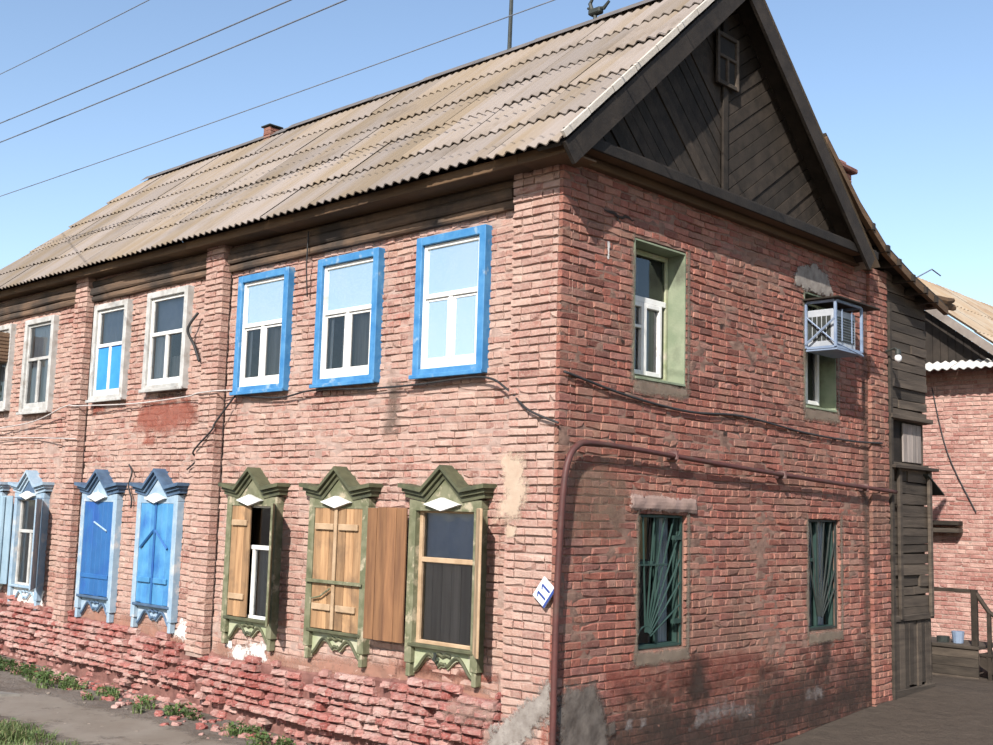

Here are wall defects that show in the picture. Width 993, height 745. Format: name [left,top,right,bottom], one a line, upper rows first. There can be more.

spalling [0,595,503,745]
water stain [606,640,873,745]